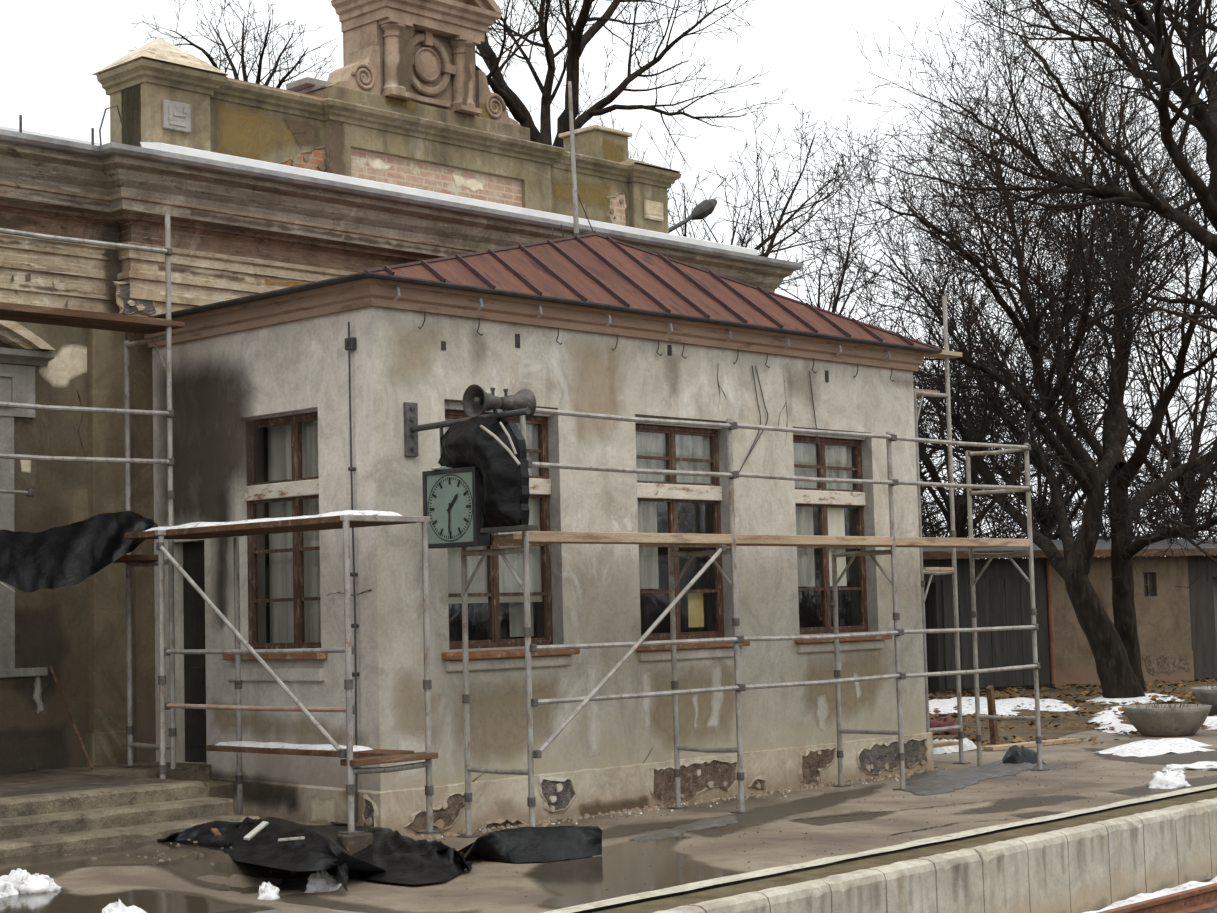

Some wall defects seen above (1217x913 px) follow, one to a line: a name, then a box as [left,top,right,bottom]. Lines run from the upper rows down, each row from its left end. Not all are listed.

flaking render [277,146,327,172]
peeling [368,158,390,169]
peeling [452,174,484,191]
flaking render [606,191,629,226]
flaking render [404,792,465,834]
flaking render [538,776,578,814]
flaking render [650,757,766,806]
flaking render [798,746,837,785]
flaking render [856,737,928,775]